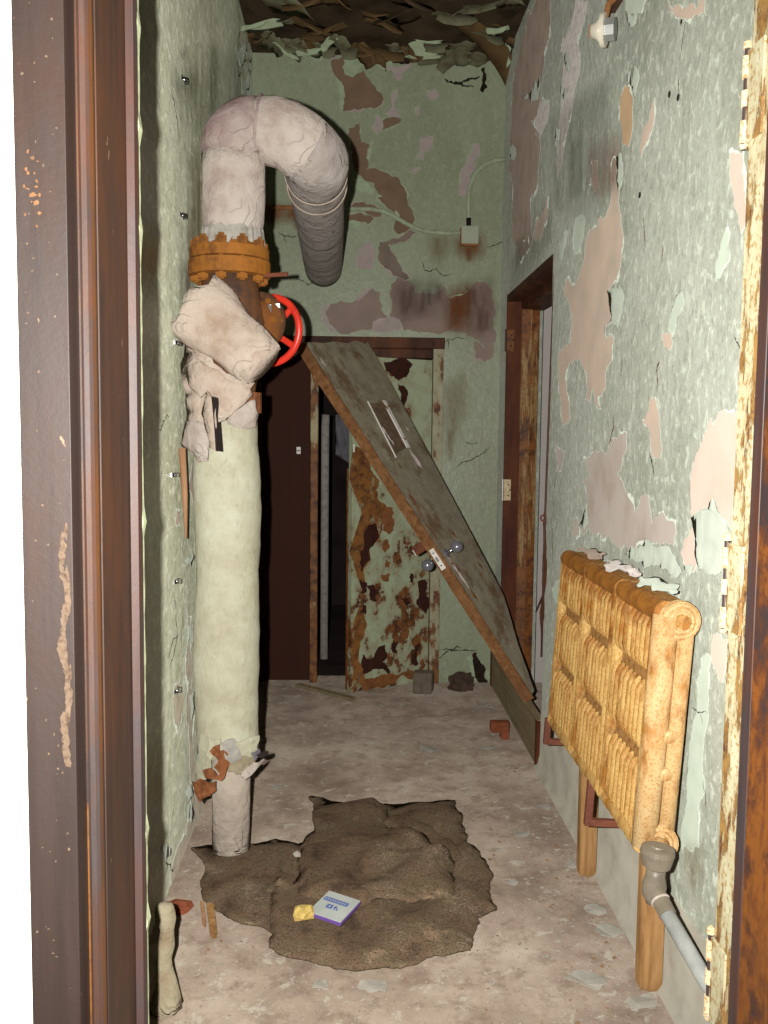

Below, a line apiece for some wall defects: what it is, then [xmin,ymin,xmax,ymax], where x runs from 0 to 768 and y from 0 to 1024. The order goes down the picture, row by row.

peeling [626,0,646,27]
peeling [667,0,706,25]
peeling [235,0,588,362]
peeling [558,66,656,426]
peeling [715,147,747,282]
peeling [662,291,685,351]
peeling [642,397,662,459]
peeling [572,409,737,578]
peeling [539,518,560,627]
peeling [681,633,728,852]